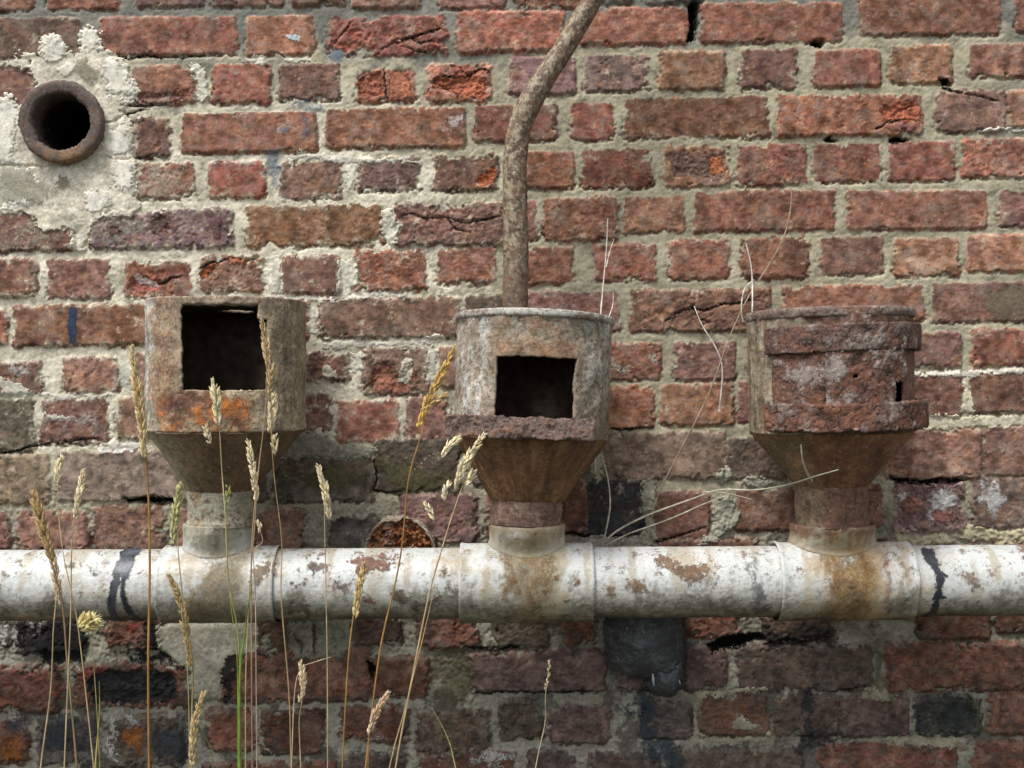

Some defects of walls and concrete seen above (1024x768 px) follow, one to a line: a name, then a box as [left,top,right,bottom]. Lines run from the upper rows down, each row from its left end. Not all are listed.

crack [383,28,441,99]
spalling [432,64,488,102]
crack [941,87,1000,101]
crack [875,107,917,129]
peeling [0,24,193,252]
crack [399,212,500,232]
crack [158,256,259,285]
leakage [927,486,959,525]
leakage [977,480,1007,519]